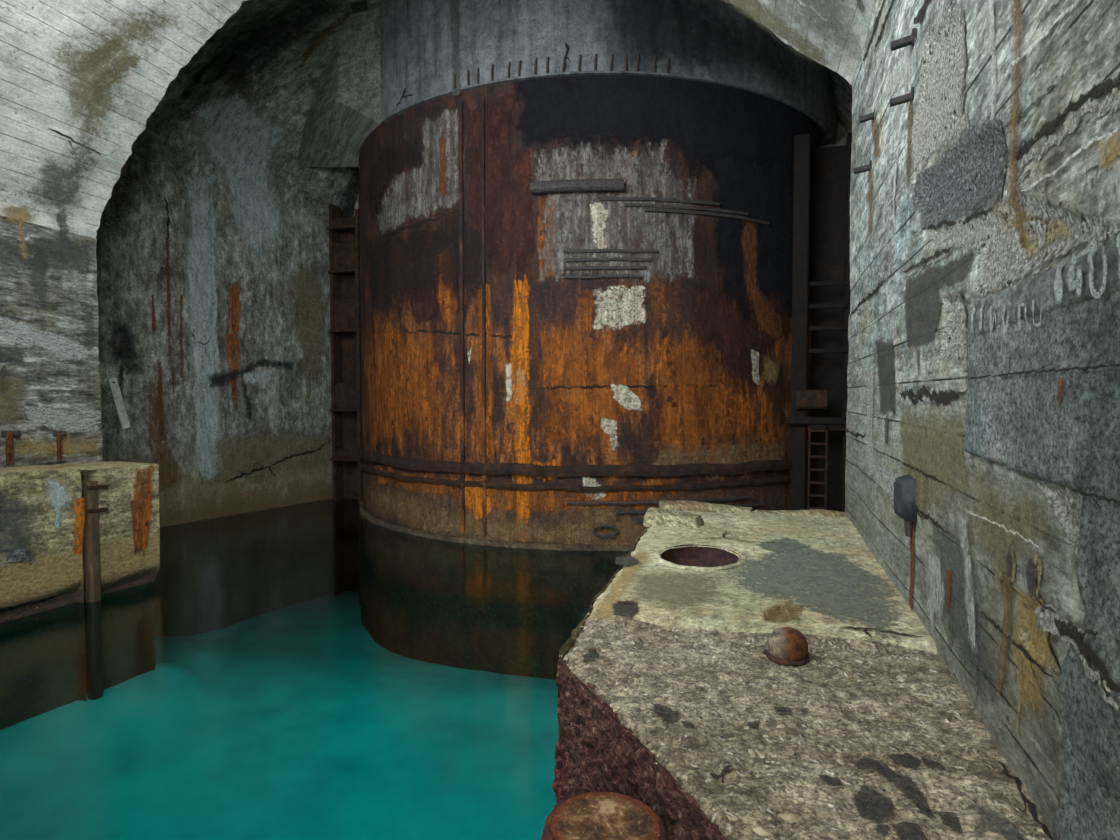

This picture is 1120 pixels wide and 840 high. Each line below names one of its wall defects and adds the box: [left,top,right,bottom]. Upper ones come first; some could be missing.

water stain [81,39,139,97]
peeling [379,110,464,232]
spalling [454,64,493,89]
peeling [508,54,825,332]
crack [850,71,1120,321]
corrosion [1007,0,1028,251]
peeling [0,316,96,360]
corrosion [131,237,183,553]
peeling [505,363,525,403]
corrosion [366,274,676,542]
corrosion [742,222,783,338]
corrosion [73,497,86,555]